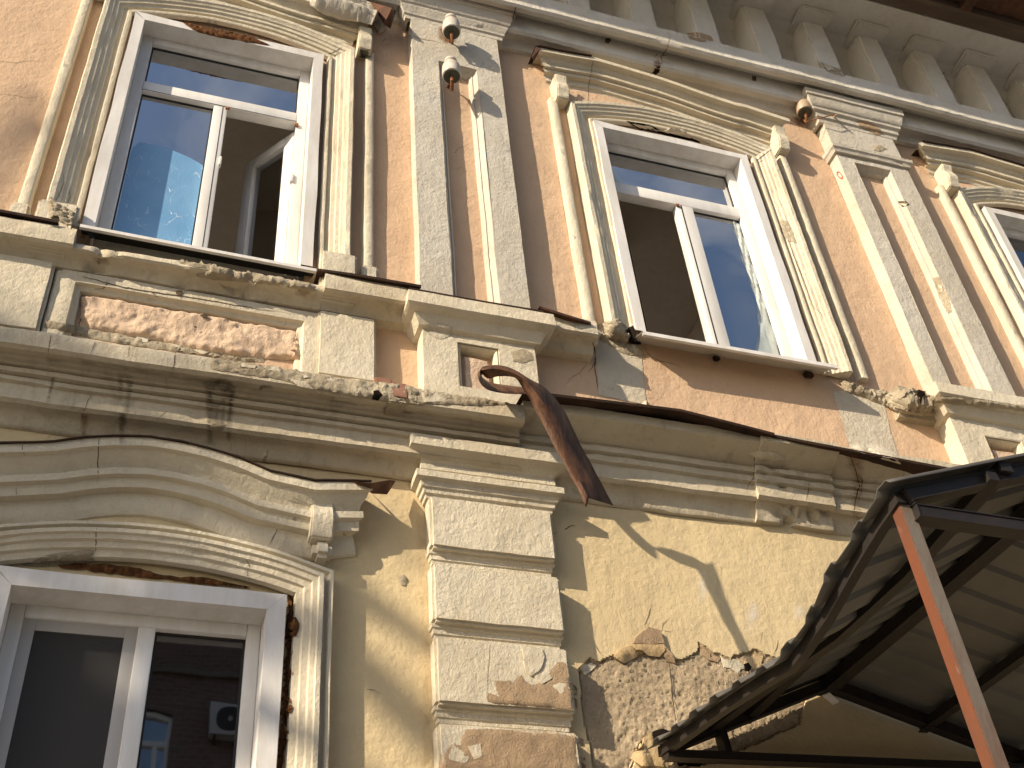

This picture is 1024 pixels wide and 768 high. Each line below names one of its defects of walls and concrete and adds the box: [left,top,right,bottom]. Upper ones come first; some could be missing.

spalling [178,259,315,291]
spalling [44,320,313,389]
crack [565,345,598,386]
crack [851,458,863,523]
spalling [438,627,775,768]
spalling [727,701,804,752]